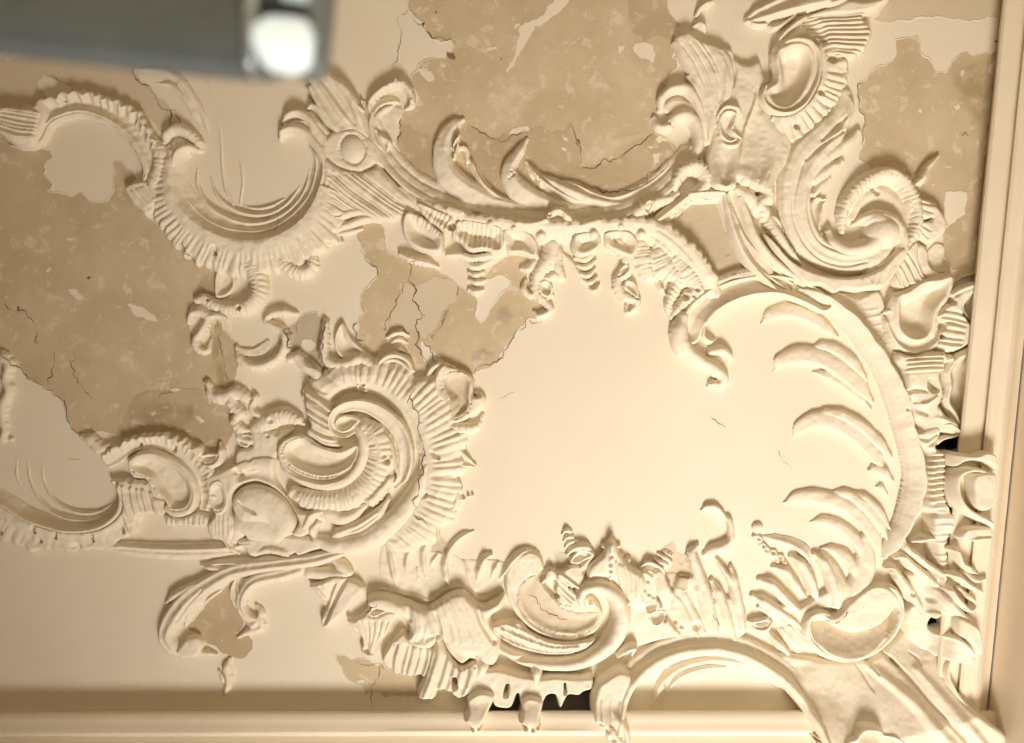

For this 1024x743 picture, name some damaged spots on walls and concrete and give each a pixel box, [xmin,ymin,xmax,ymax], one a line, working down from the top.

peeling [397,0,683,198]
peeling [856,35,998,272]
peeling [0,134,241,453]
peeling [353,223,544,420]
peeling [187,582,255,660]
peeling [335,653,423,703]